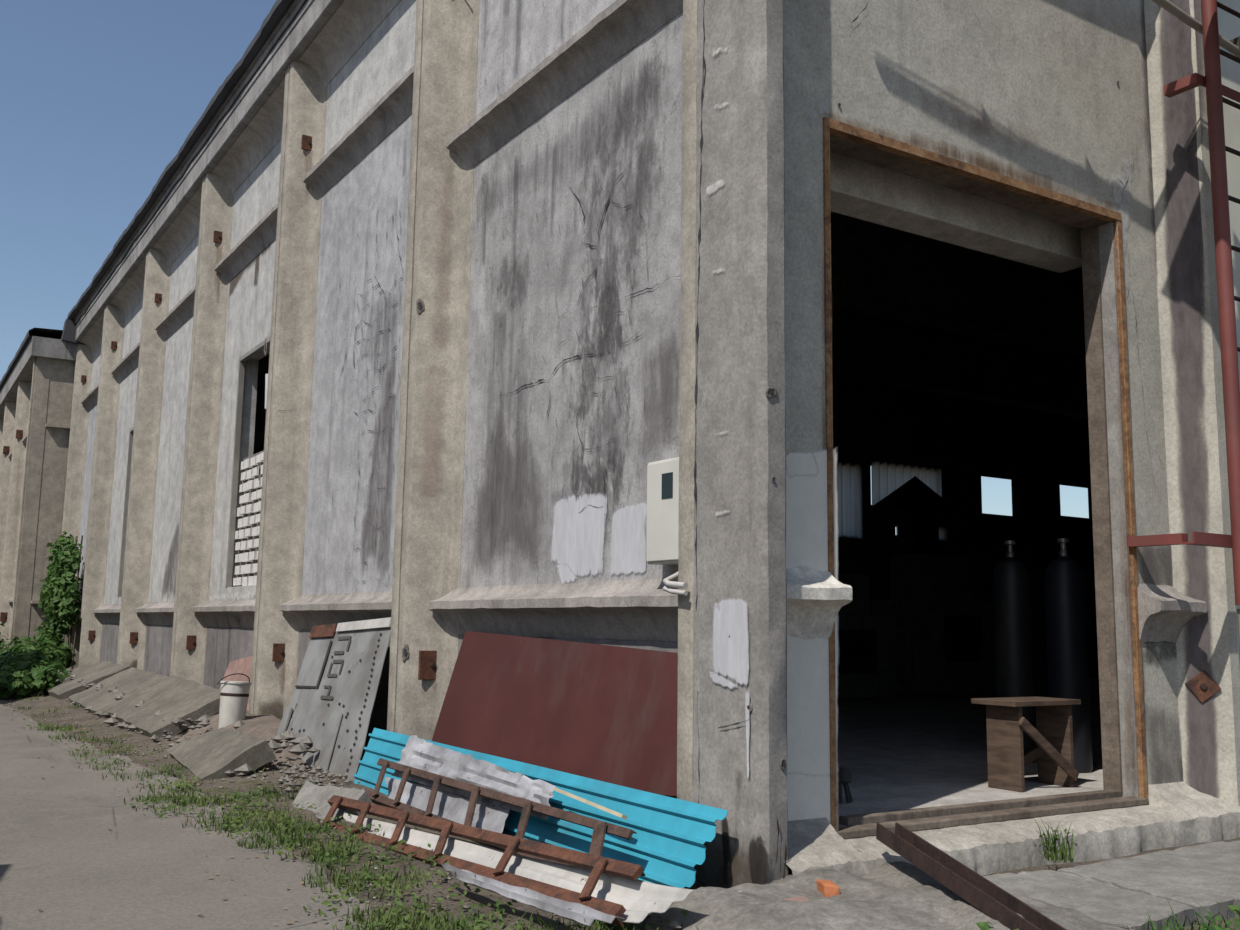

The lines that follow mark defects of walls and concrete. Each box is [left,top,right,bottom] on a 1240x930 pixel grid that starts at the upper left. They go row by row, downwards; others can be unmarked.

damp [362,373,391,560]
crack [505,0,706,612]
damp [650,343,675,438]
damp [1142,0,1218,798]